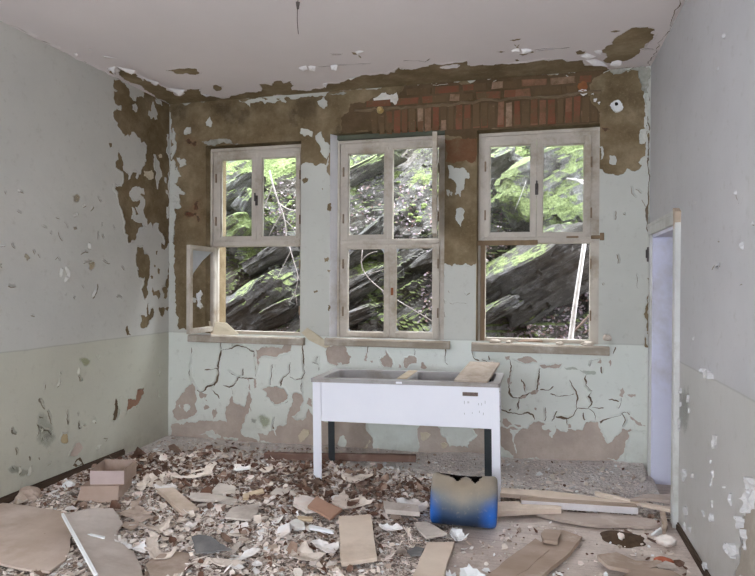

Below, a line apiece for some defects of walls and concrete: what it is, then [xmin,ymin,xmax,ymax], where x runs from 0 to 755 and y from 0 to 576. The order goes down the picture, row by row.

peeling [107,26,658,332]
peeling [37,384,97,445]
peeling [111,385,145,422]
crack [189,343,321,402]
peeling [170,345,375,449]
peeling [364,347,427,369]
peeling [415,426,484,454]
peeling [505,355,596,375]
crack [472,347,631,427]
peeling [500,417,647,464]
peeling [722,477,755,576]